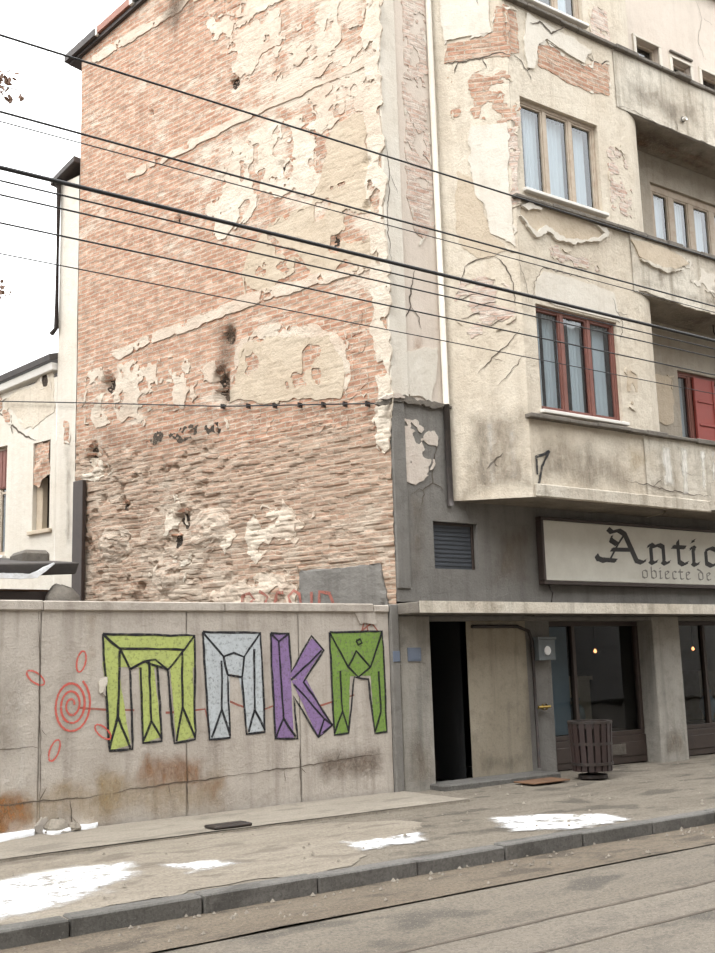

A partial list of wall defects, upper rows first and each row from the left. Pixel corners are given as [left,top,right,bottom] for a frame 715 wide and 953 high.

flaking render [440,0,611,96]
flaking render [82,0,438,454]
flaking render [450,70,620,323]
flaking render [606,145,633,218]
crack [478,329,520,385]
flaking render [82,442,113,482]
flaking render [405,419,438,485]
flaking render [163,494,192,582]
flaking render [208,499,316,603]
crack [0,613,379,831]